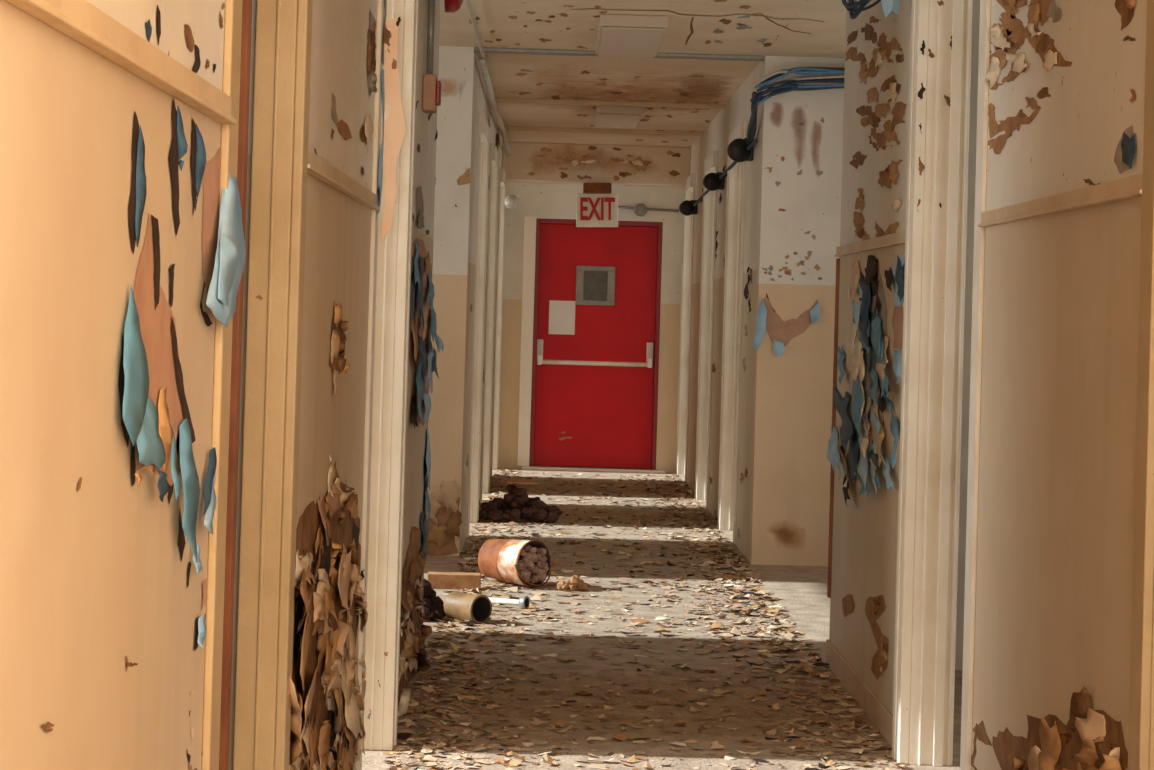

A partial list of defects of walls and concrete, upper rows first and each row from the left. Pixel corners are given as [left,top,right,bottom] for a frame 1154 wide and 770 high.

peeling [118,112,217,651]
peeling [168,98,245,328]
peeling [329,301,350,396]
peeling [331,0,419,240]
peeling [398,186,462,718]
peeling [705,5,798,47]
peeling [744,267,820,357]
peeling [827,255,905,506]
peeling [845,16,906,240]
peeling [984,0,1072,155]
peeling [289,455,368,770]
peeling [973,686,1128,770]